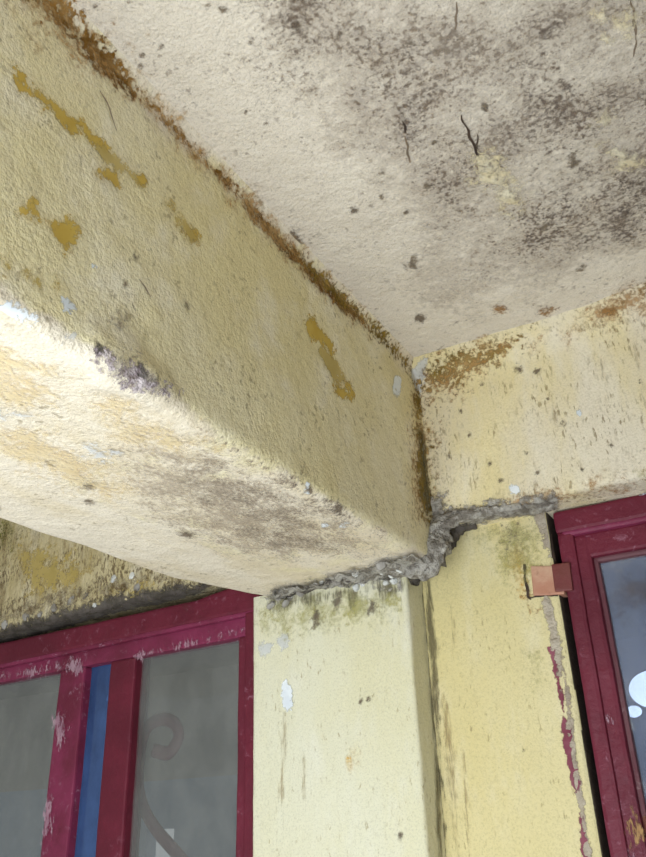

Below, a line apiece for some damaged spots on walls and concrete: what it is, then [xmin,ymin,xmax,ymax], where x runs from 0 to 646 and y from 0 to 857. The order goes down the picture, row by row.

crack [628,0,637,57]
peeling [19,196,82,258]
peeling [12,65,149,190]
rust [22,0,390,337]
crack [461,115,479,157]
peeling [305,314,355,402]
damp [585,283,646,320]
damp [369,326,523,523]
damp [275,471,350,519]
spalling [257,485,559,611]
damp [422,581,446,853]
spalling [541,595,592,857]